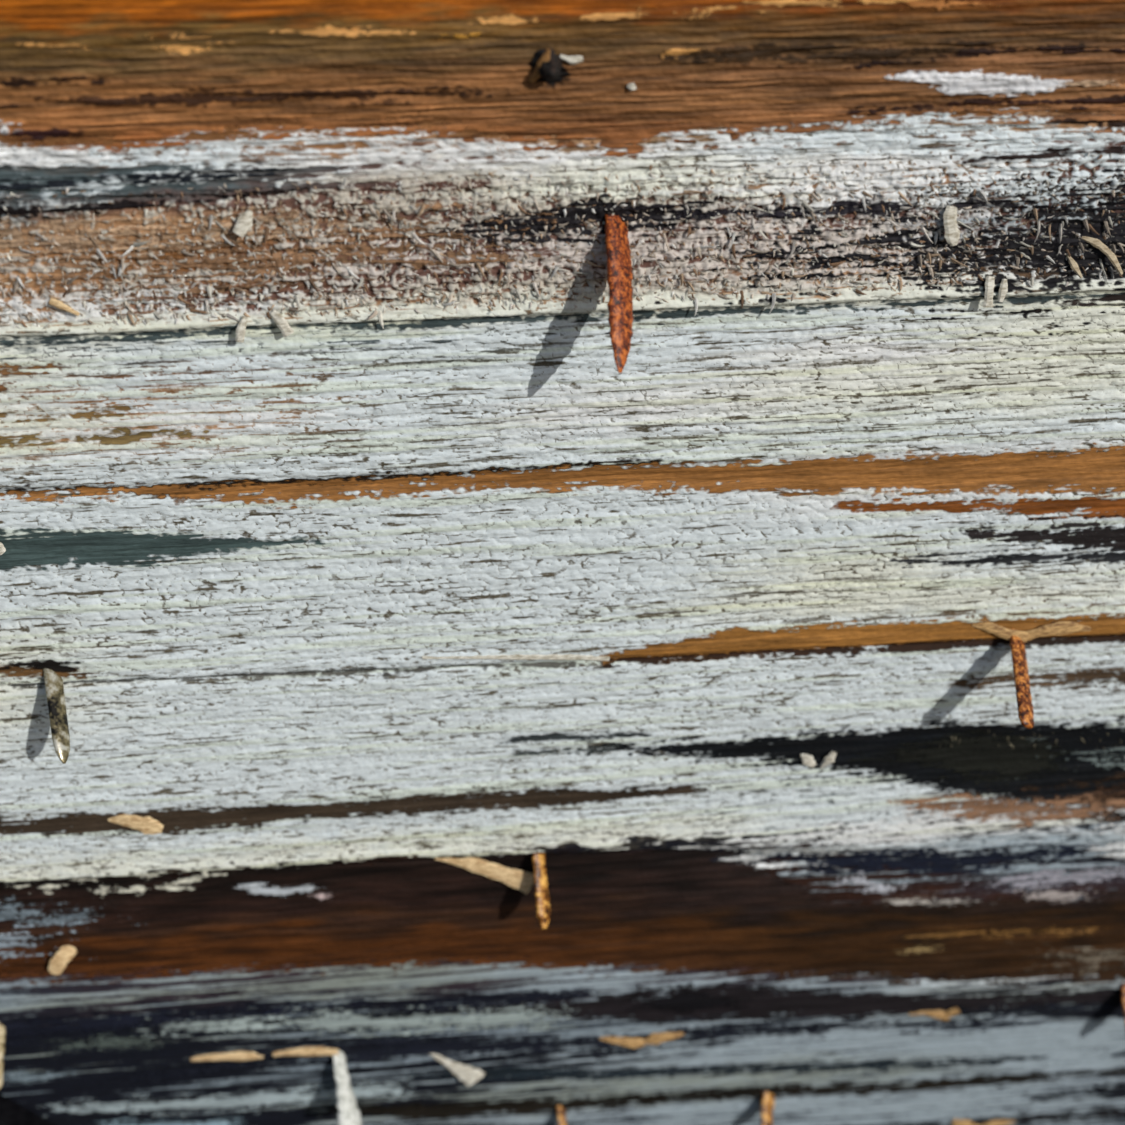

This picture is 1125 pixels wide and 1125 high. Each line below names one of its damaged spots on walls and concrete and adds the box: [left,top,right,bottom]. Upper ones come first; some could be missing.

peeling [0,0,1125,167]
peeling [0,168,1125,335]
peeling [0,443,1125,571]
peeling [600,613,1125,668]
peeling [0,713,1125,987]
peeling [52,1005,587,1052]
peeling [3,1072,74,1083]
peeling [43,1083,338,1125]
peeling [352,1078,416,1101]